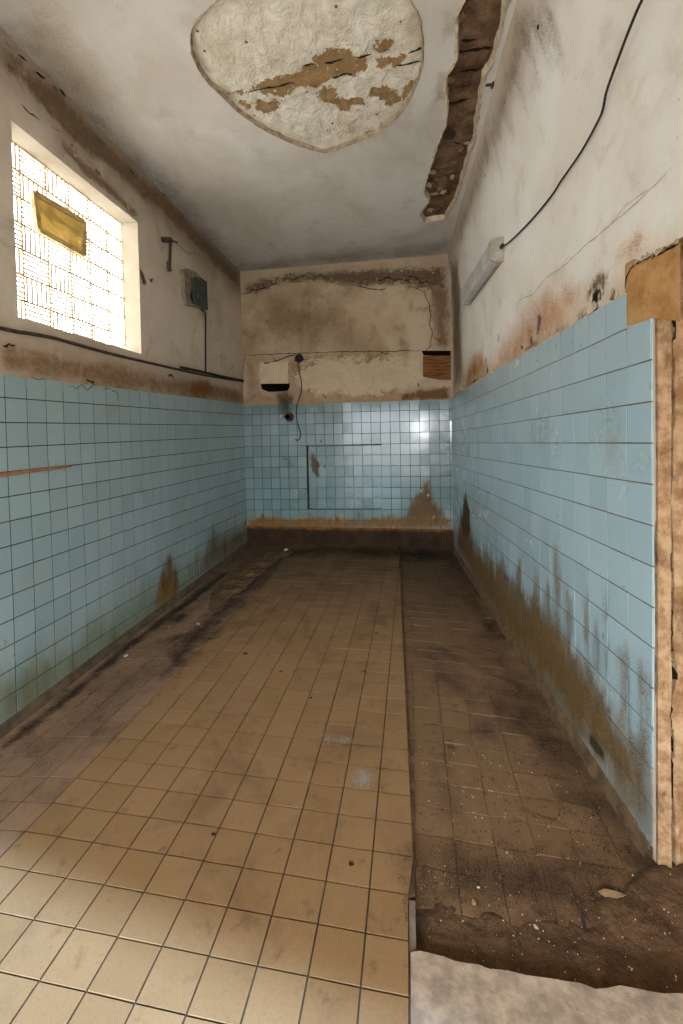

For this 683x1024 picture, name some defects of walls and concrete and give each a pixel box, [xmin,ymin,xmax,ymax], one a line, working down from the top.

flaking render [0,43,450,296]
damp [0,0,569,405]
flaking render [190,0,424,153]
crack [243,286,433,375]
flaking render [420,0,512,223]
rust [465,221,649,386]
crack [514,169,670,308]
damp [489,547,653,745]